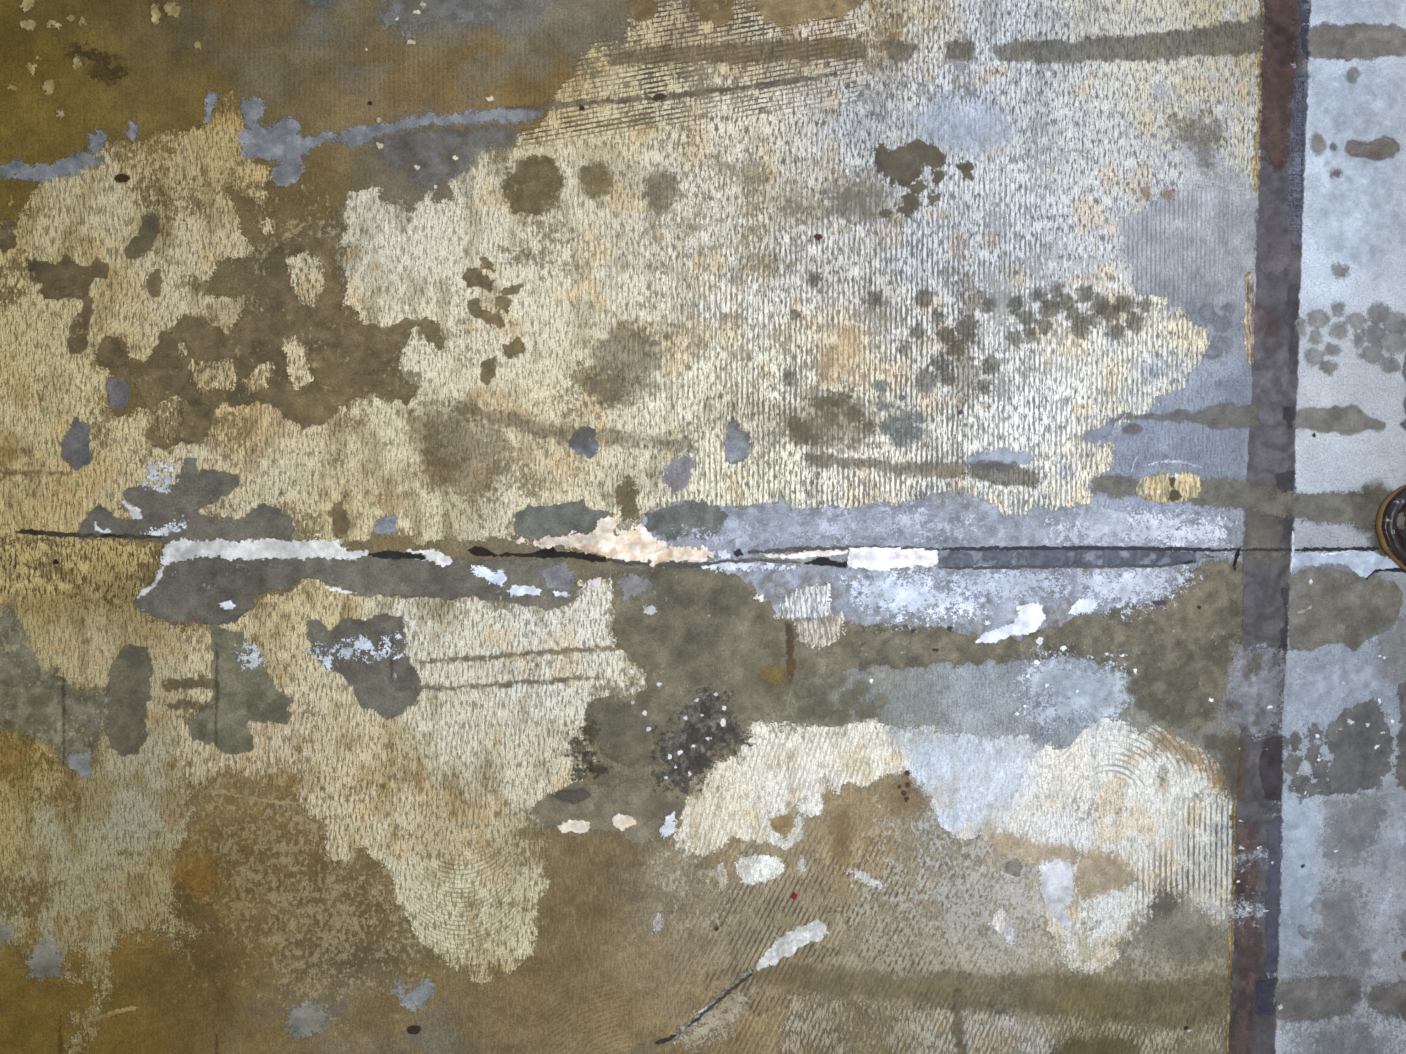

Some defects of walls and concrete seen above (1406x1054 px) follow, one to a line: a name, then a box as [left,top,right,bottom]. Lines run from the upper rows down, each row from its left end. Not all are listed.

damp [1307,23,1406,82]
damp [879,161,974,218]
damp [1296,303,1406,381]
peeling [569,426,599,459]
damp [1294,398,1406,435]
peeling [27,213,591,755]
crack [16,529,162,540]
crack [368,550,426,560]
crack [468,544,1406,580]
peeling [513,449,1244,845]
peeling [0,600,153,781]
damp [1272,682,1406,1054]